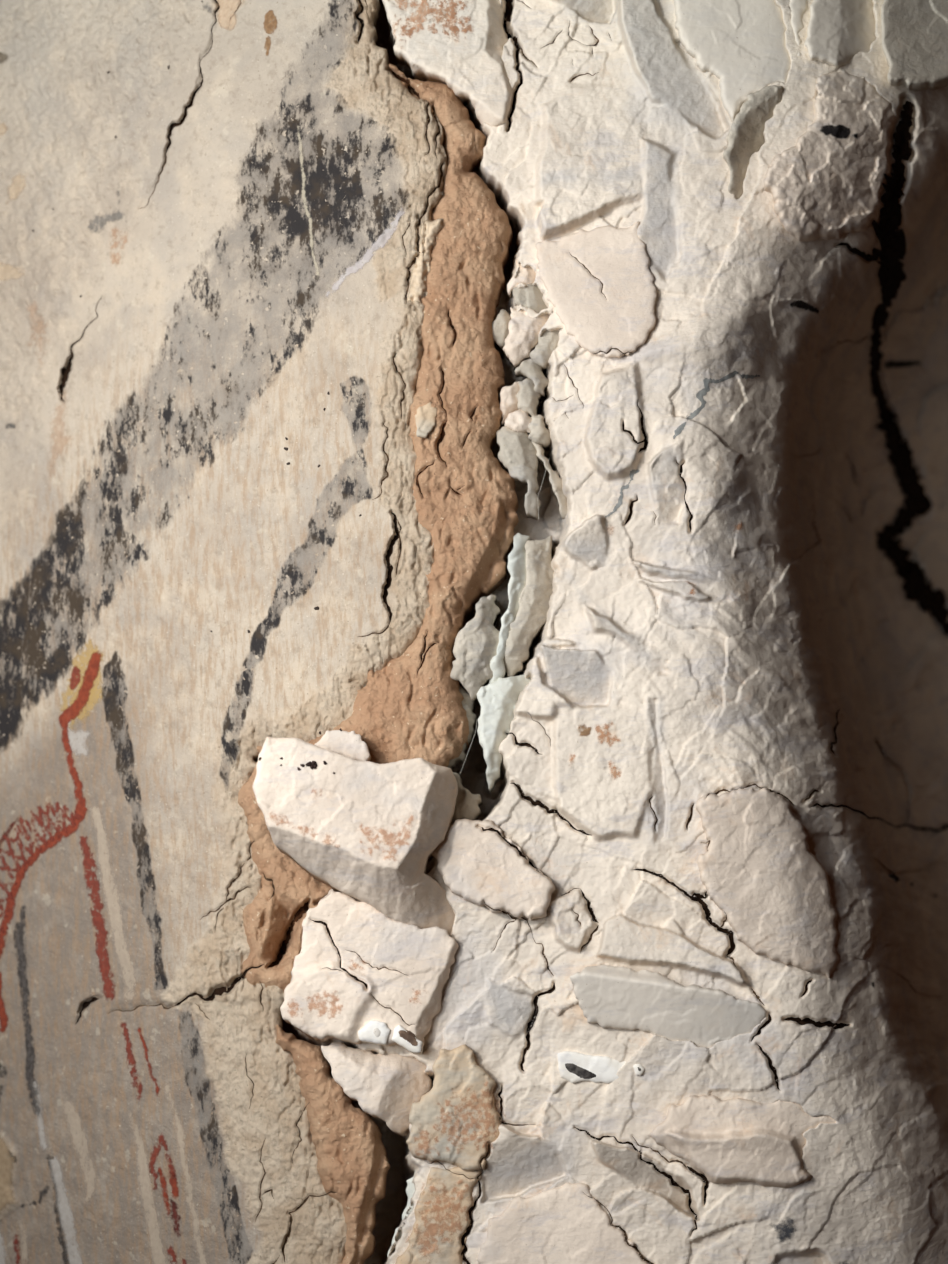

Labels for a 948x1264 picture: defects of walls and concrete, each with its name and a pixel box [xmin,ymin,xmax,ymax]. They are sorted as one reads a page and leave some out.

crack [139,0,241,209]
peeling [218,0,240,30]
spalling [821,125,858,139]
peeling [408,219,443,302]
spalling [492,221,657,520]
crack [836,101,948,635]
spalling [448,533,554,826]
crack [76,841,412,1026]
crack [429,902,555,1264]
crack [478,826,598,950]
crack [575,1127,709,1236]
crack [634,869,850,1090]